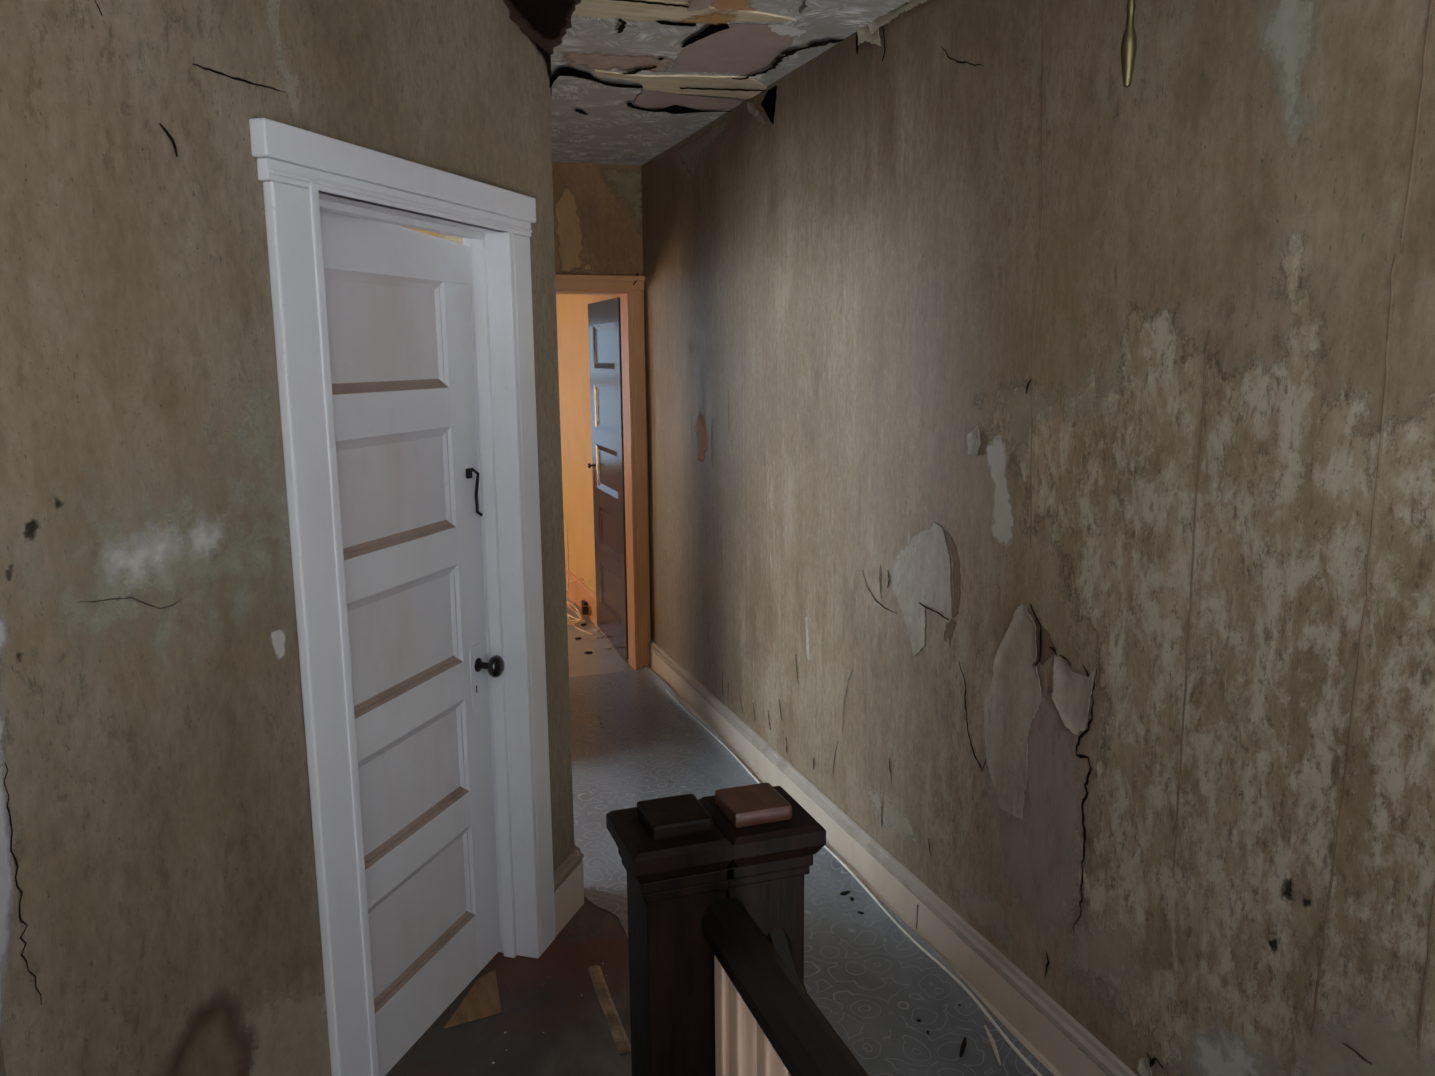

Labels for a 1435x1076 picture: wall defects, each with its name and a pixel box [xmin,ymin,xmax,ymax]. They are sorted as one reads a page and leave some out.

peeling [670,24,808,76]
peeling [857,21,881,47]
crack [192,64,288,93]
peeling [986,437,1014,544]
flaking render [0,757,42,1024]
leakage [1283,880,1311,907]